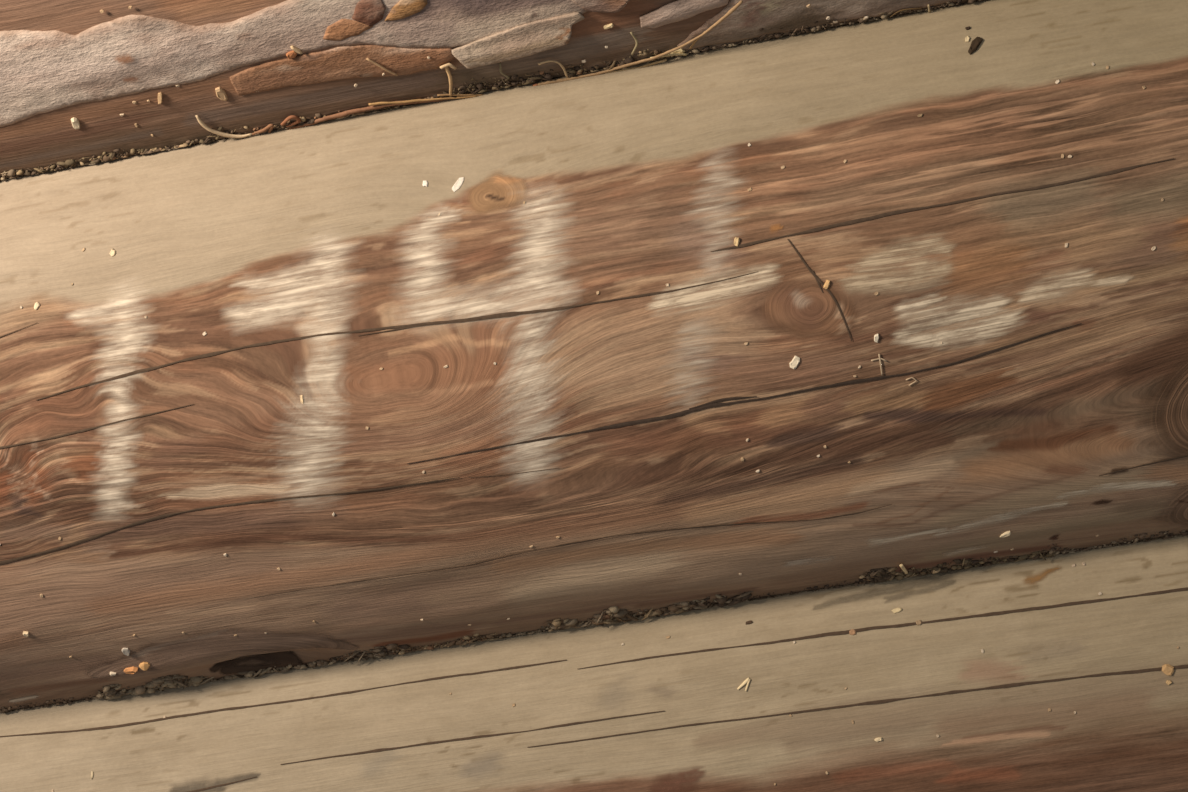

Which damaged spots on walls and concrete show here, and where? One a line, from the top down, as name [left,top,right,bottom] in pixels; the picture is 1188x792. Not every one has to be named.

peeling [230,0,454,96]
peeling [572,0,630,13]
crack [36,158,1174,401]
crack [0,323,1082,565]
crack [254,504,892,598]
crack [0,587,1188,737]
crack [187,664,1188,792]